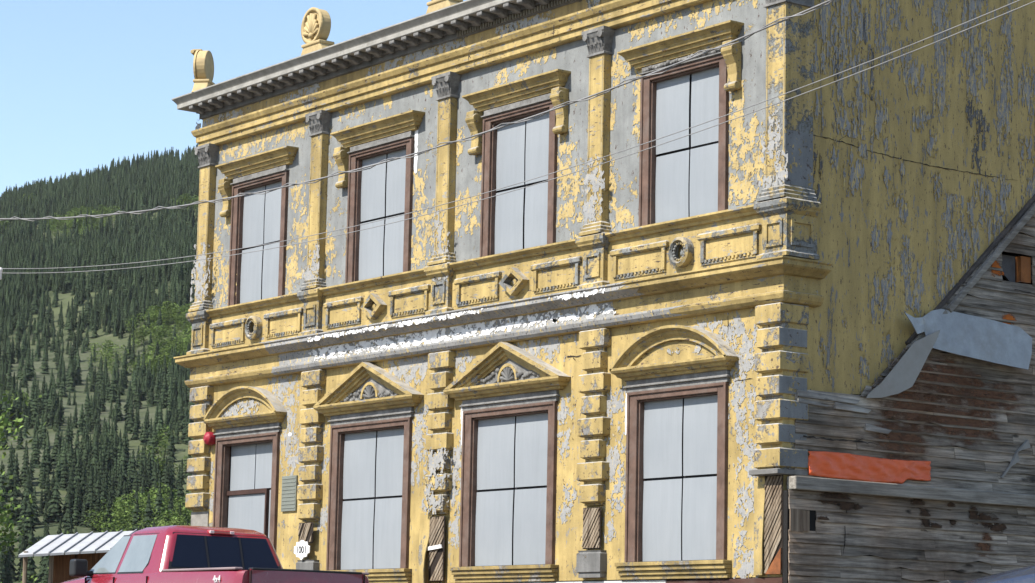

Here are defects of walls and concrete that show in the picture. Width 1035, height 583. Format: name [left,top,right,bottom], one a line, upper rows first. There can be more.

peeling [219,121,309,162]
peeling [556,0,758,240]
peeling [728,80,788,206]
crack [814,135,1017,181]
peeling [813,0,1035,380]
peeling [190,208,237,308]
peeling [219,398,260,418]
peeling [261,281,783,582]